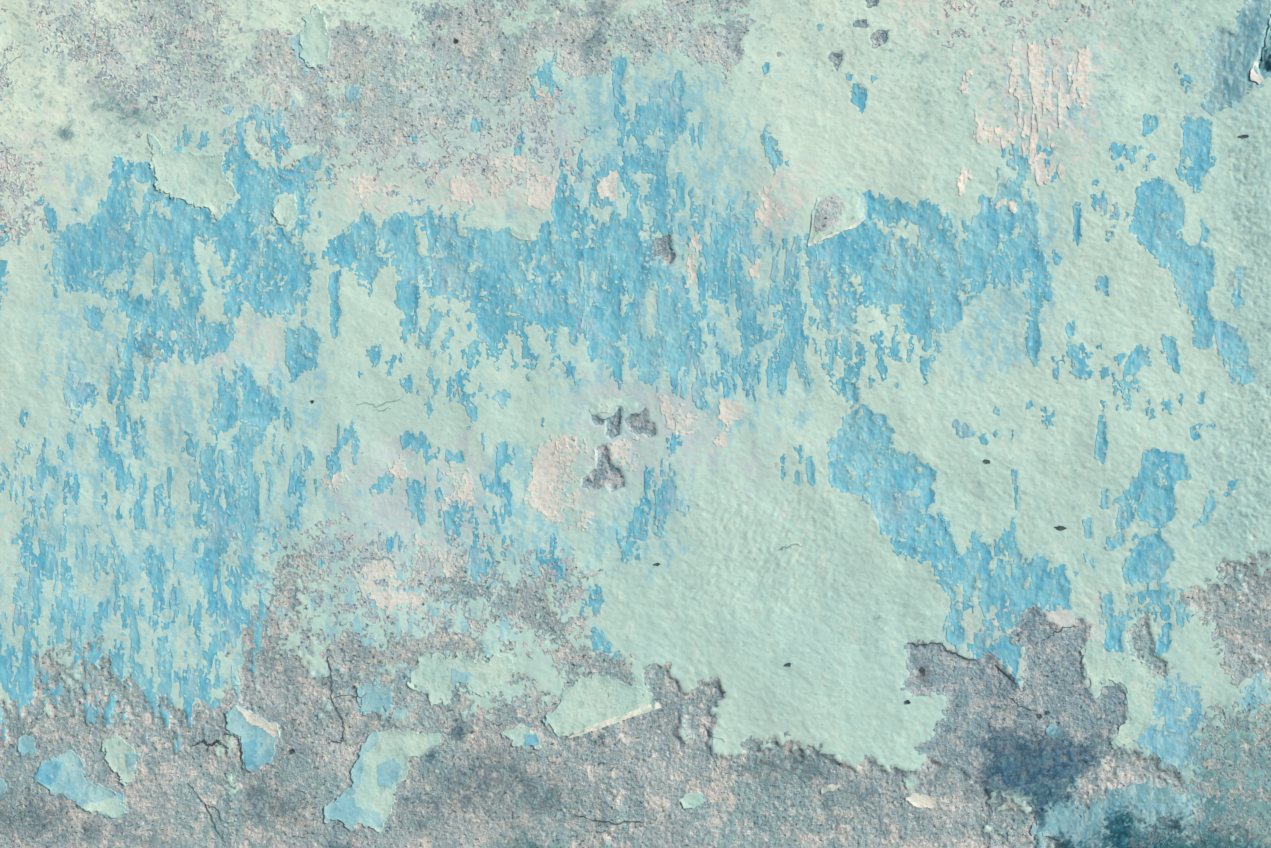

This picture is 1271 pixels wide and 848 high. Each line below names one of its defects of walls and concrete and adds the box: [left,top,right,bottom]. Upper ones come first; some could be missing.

peeling [34,0,230,121]
peeling [828,50,879,114]
flaking render [853,0,890,48]
peeling [1073,0,1271,386]
peeling [711,371,746,447]
peeling [1052,320,1184,464]
peeling [370,430,441,526]
peeling [480,441,516,534]
peeling [523,408,656,531]
peeling [140,544,181,632]
crack [327,657,367,744]
crack [192,732,247,770]